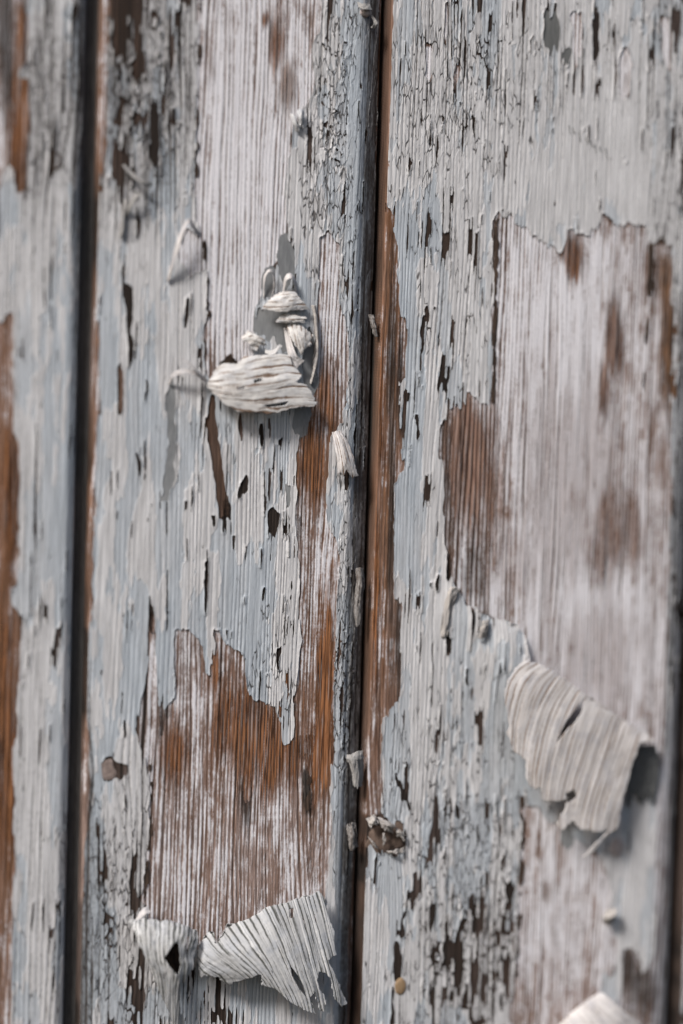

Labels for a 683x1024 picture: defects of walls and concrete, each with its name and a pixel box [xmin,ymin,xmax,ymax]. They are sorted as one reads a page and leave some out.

peeling [0,0,86,1024]
peeling [80,0,381,1024]
peeling [361,0,683,1024]